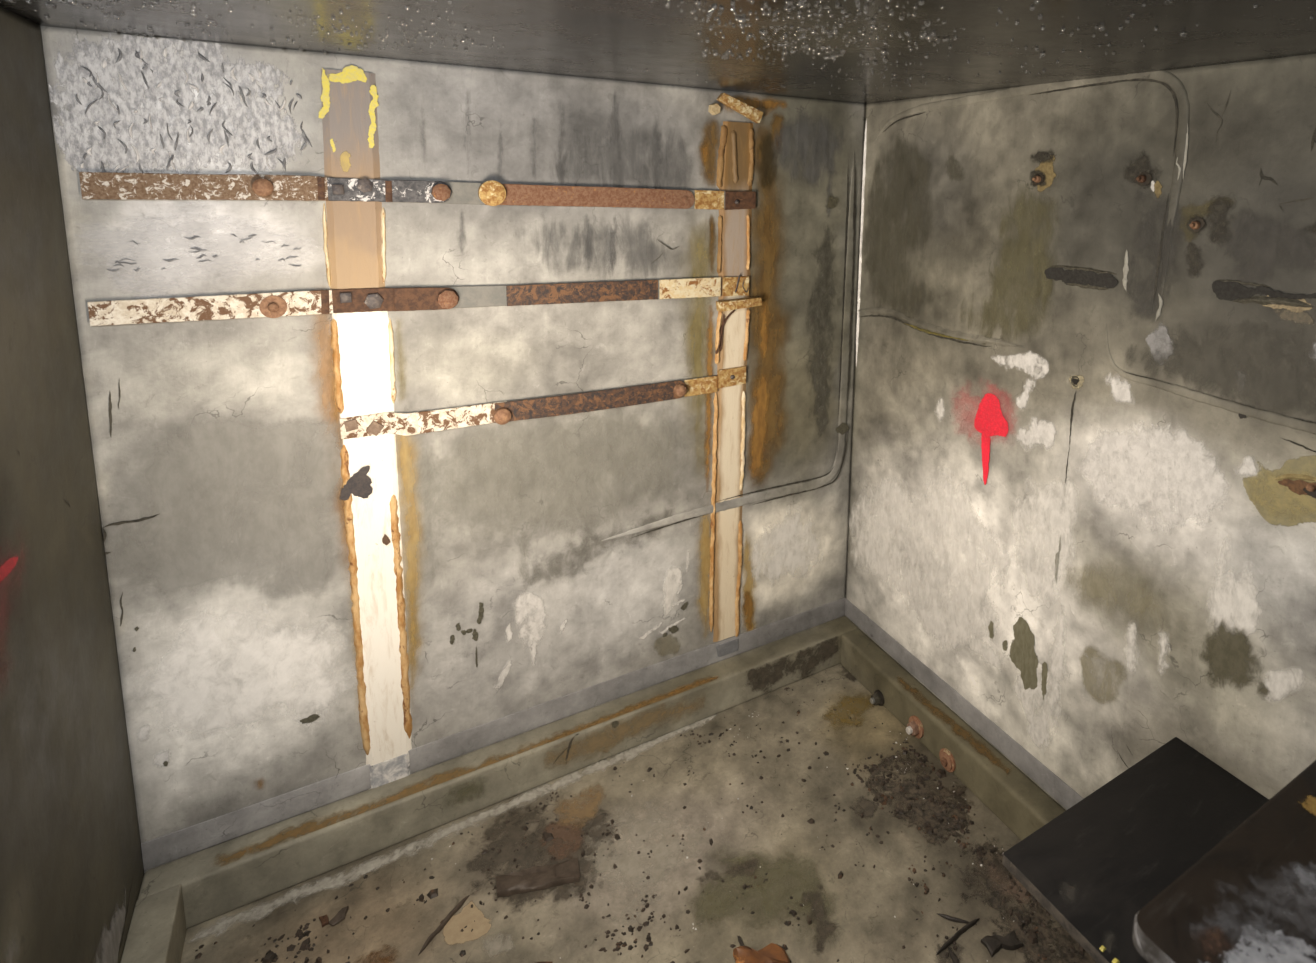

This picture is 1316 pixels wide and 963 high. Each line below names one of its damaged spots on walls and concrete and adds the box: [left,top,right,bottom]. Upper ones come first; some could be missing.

rust [317,178,325,200]
rust [385,181,393,202]
rust [700,121,718,185]
rust [691,217,715,278]
rust [724,96,785,483]
rust [317,291,342,450]
rust [688,297,713,378]
rust [693,393,711,479]
rust [399,435,420,664]